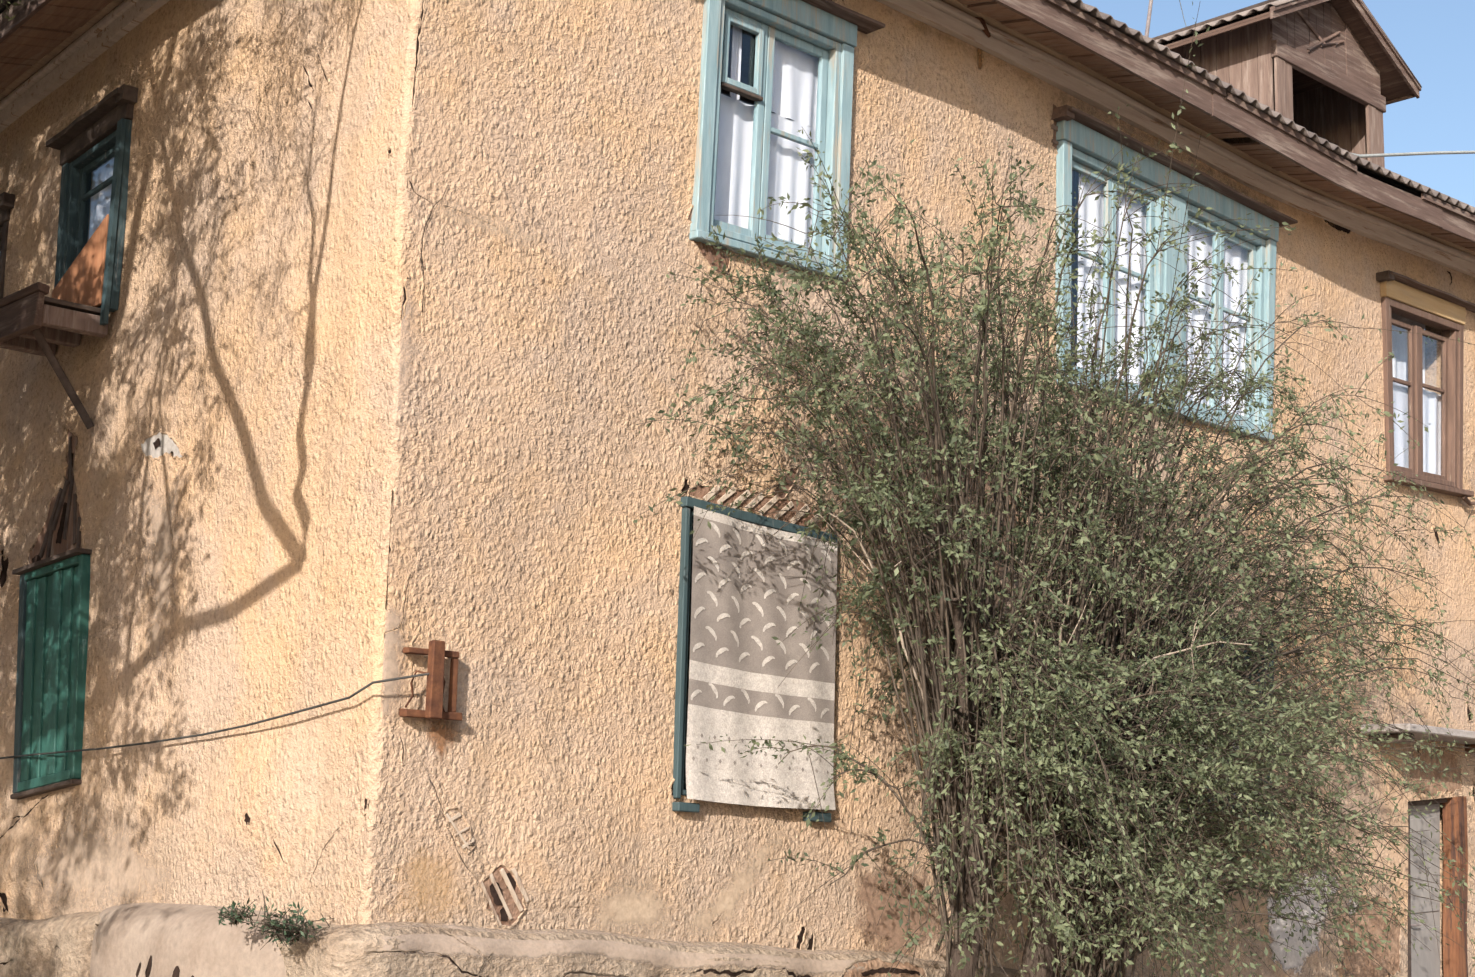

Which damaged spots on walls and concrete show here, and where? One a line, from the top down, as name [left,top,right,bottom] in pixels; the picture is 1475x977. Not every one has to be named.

crack [401,0,497,335]
crack [398,736,479,884]
crack [711,910,726,926]
crack [364,931,494,977]
crack [560,964,815,977]